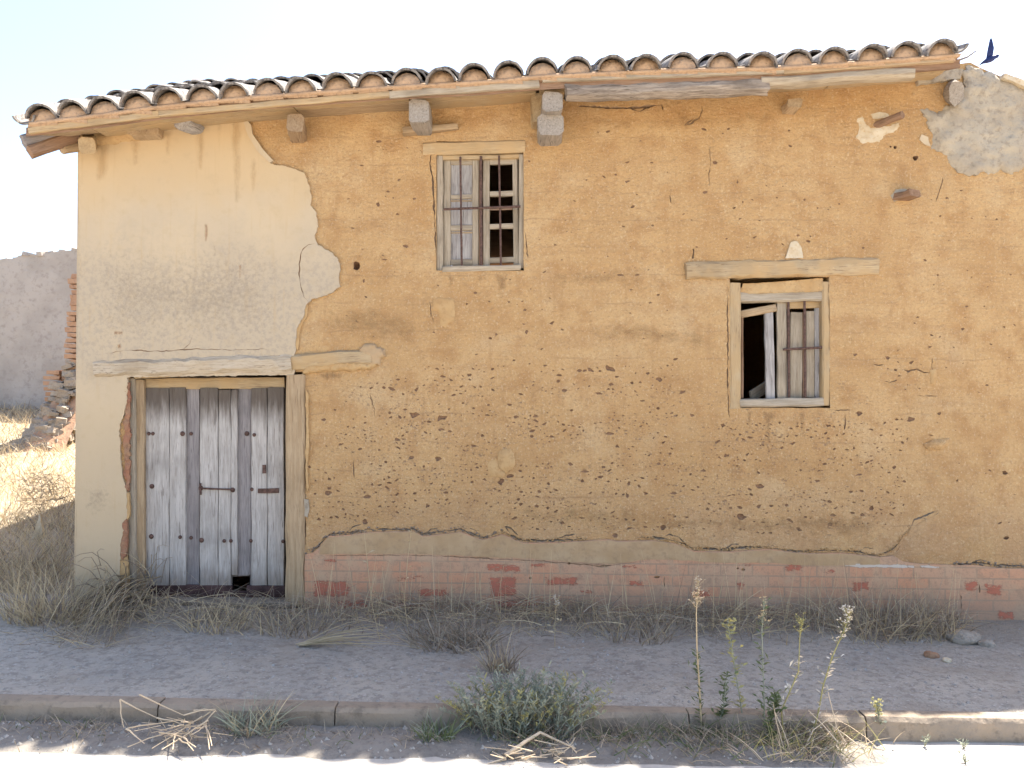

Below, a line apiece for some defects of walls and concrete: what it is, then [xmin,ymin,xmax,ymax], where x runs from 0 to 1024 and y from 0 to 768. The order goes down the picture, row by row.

peeling [915,69,963,86]
peeling [4,121,341,602]
crack [305,511,939,587]
spalling [314,581,368,608]
spalling [487,564,592,608]